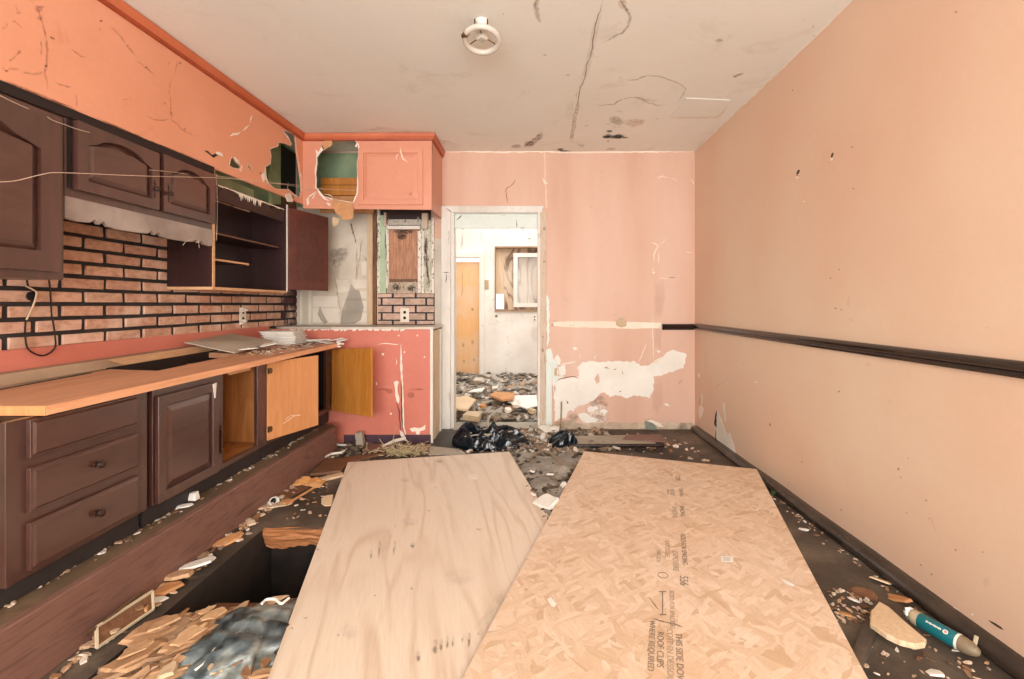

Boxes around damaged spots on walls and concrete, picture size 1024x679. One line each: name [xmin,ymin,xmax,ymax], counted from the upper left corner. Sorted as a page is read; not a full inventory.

crack [571,5,602,137]
peeling [377,215,434,293]
flaking render [546,294,687,427]
peeling [698,394,736,453]